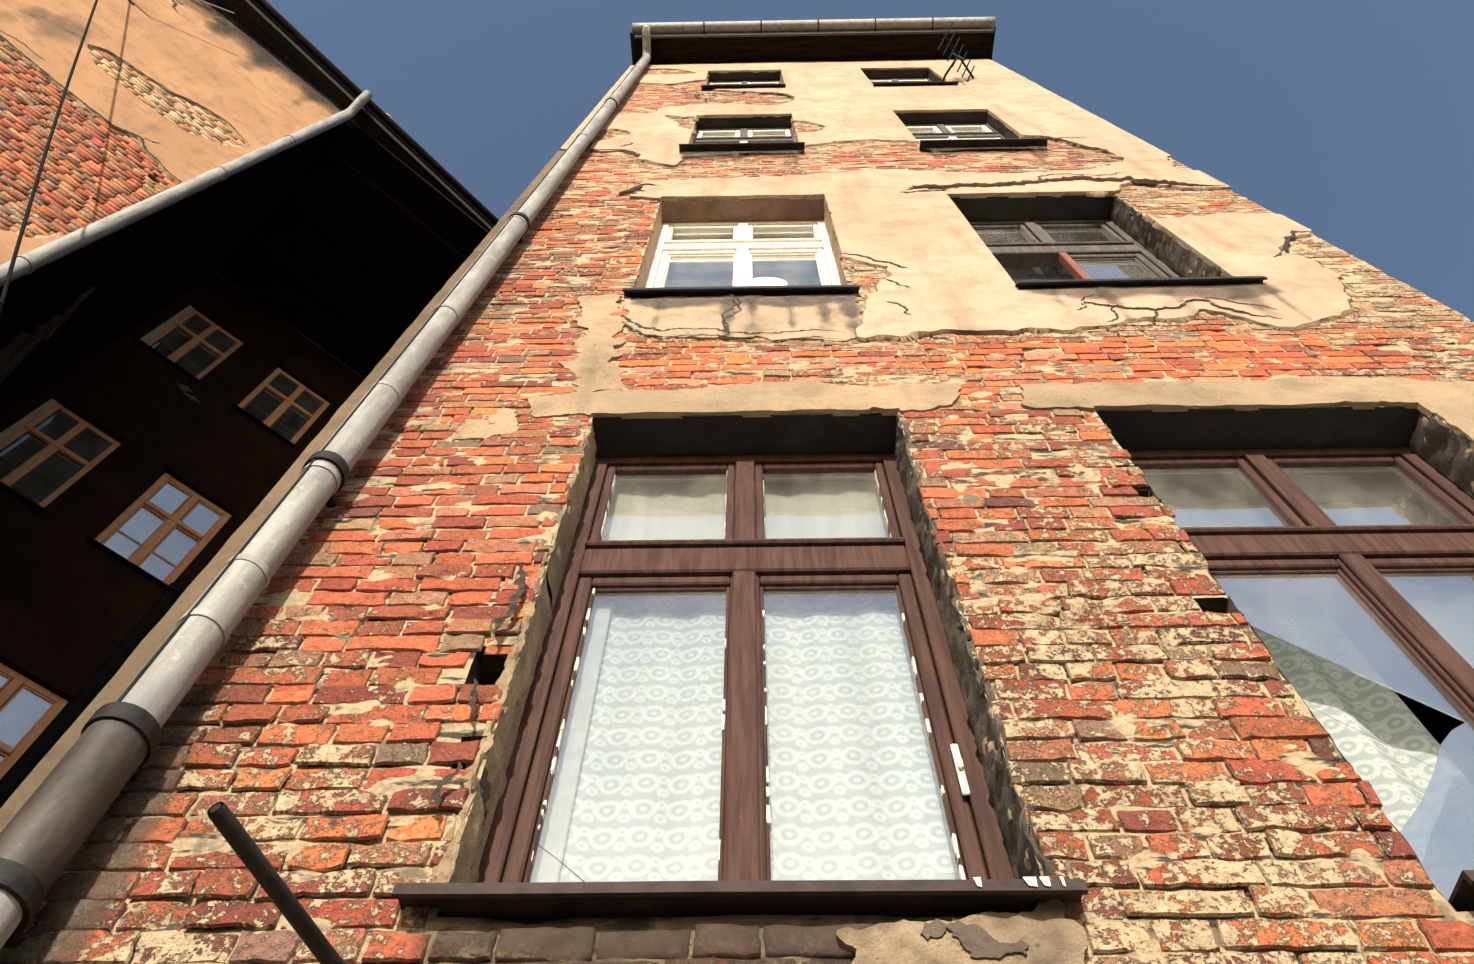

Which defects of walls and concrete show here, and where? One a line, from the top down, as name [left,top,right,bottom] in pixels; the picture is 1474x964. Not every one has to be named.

peeling [0,37,181,238]
peeling [87,44,249,147]
peeling [591,68,1124,187]
crack [903,135,1224,193]
peeling [1086,156,1275,277]
crack [842,252,911,315]
peeling [837,233,1464,343]
crack [1075,296,1282,322]
spalling [432,421,597,883]
flaking render [836,414,1089,964]